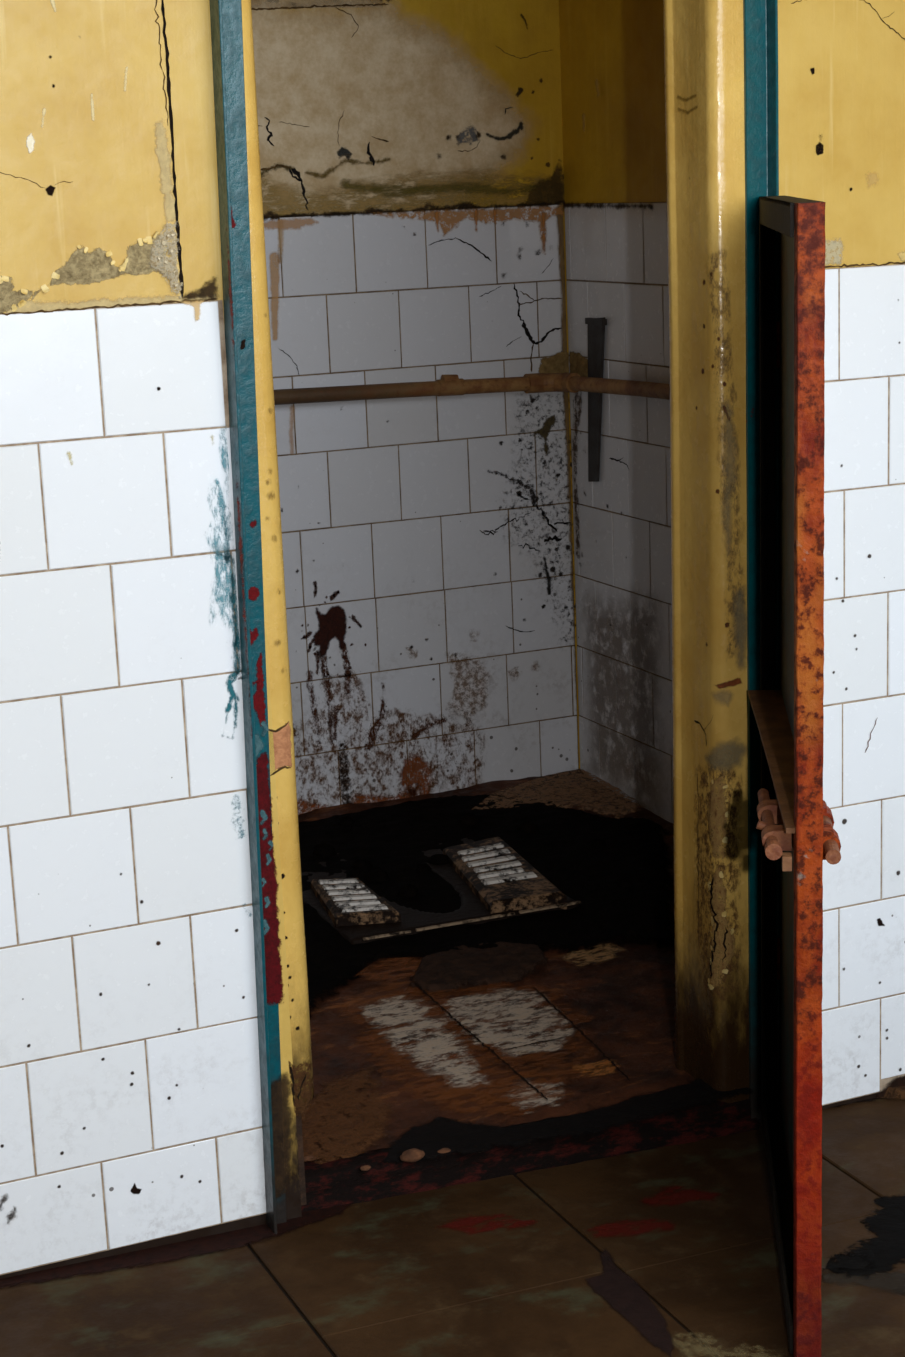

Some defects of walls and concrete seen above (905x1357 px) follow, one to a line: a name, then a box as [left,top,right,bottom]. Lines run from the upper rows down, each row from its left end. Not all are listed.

crack [864,0,905,40]
crack [258,117,309,210]
crack [367,136,389,166]
peeling [252,4,524,216]
crack [486,107,524,159]
flaking render [0,221,183,313]
crack [430,237,562,372]
water stain [301,582,366,805]
water stain [364,683,385,750]
water stain [412,718,446,740]
peeling [696,742,745,1001]
water stain [821,1195,905,1295]